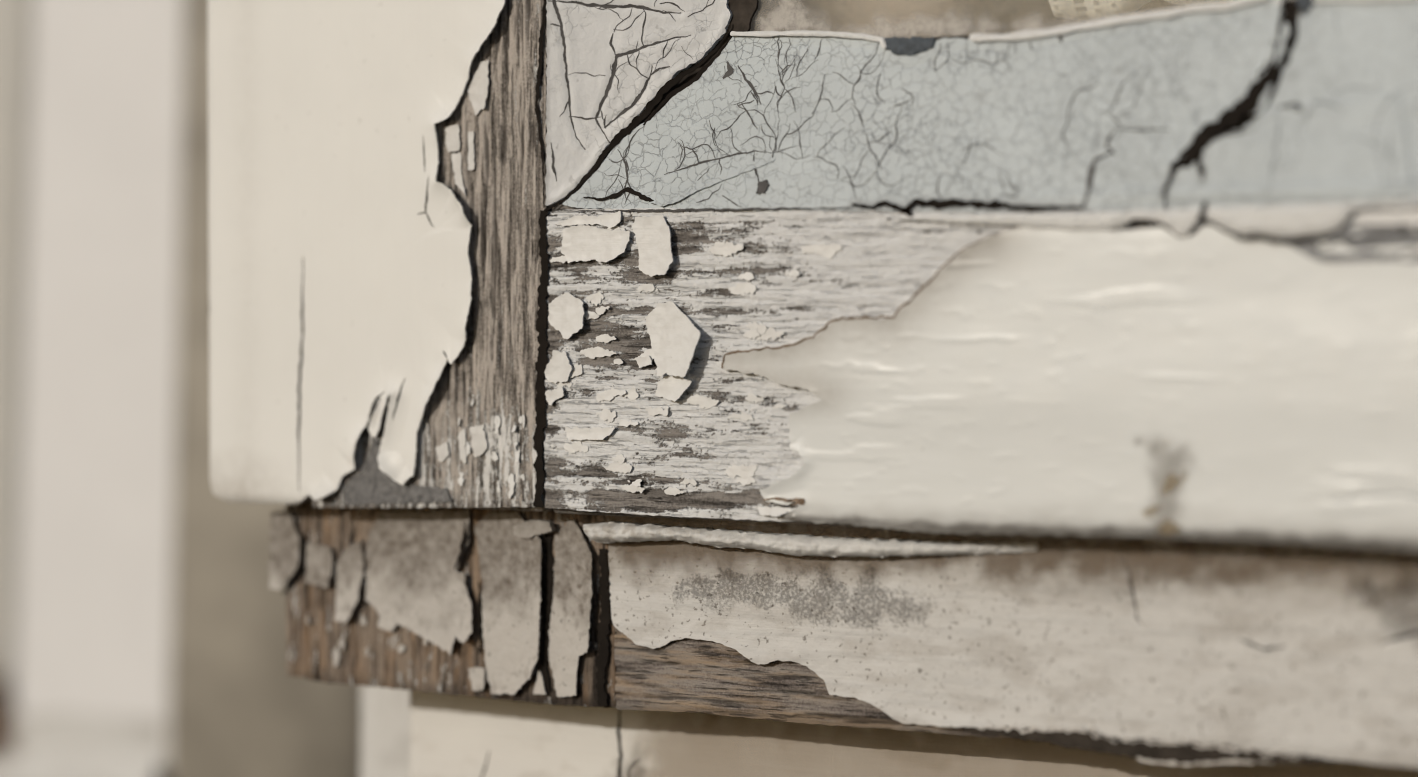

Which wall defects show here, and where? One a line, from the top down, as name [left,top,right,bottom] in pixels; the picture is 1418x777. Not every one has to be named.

crack [296,259,304,492]
peeling [268,0,1093,740]
crack [533,0,1354,692]
crack [454,522,483,653]
crack [595,549,640,777]